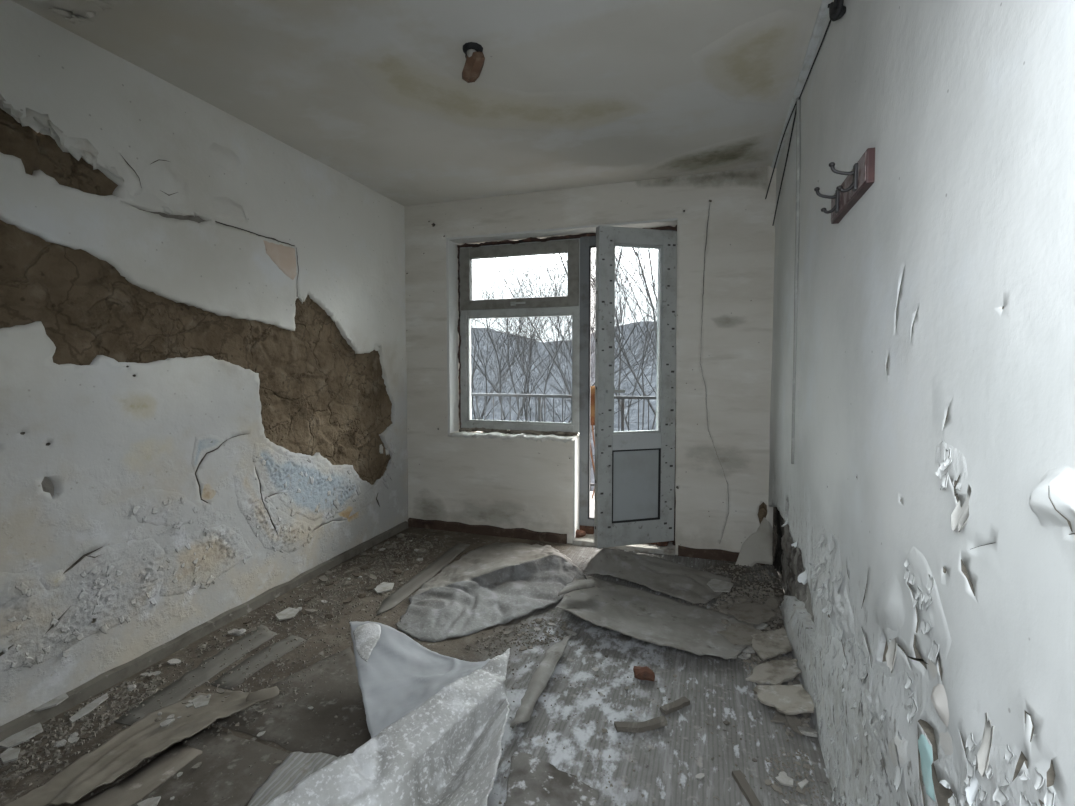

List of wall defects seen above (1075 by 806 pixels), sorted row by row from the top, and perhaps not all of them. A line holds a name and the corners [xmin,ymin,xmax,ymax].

leakage [340,33,663,133]
leakage [691,9,809,108]
flaking render [0,94,124,196]
flaking render [137,206,206,223]
flaking render [0,220,392,485]
peeling [0,467,316,672]
flaking render [758,502,814,622]
peeling [904,546,952,665]
peeling [811,635,1061,806]
flaking render [775,771,808,790]